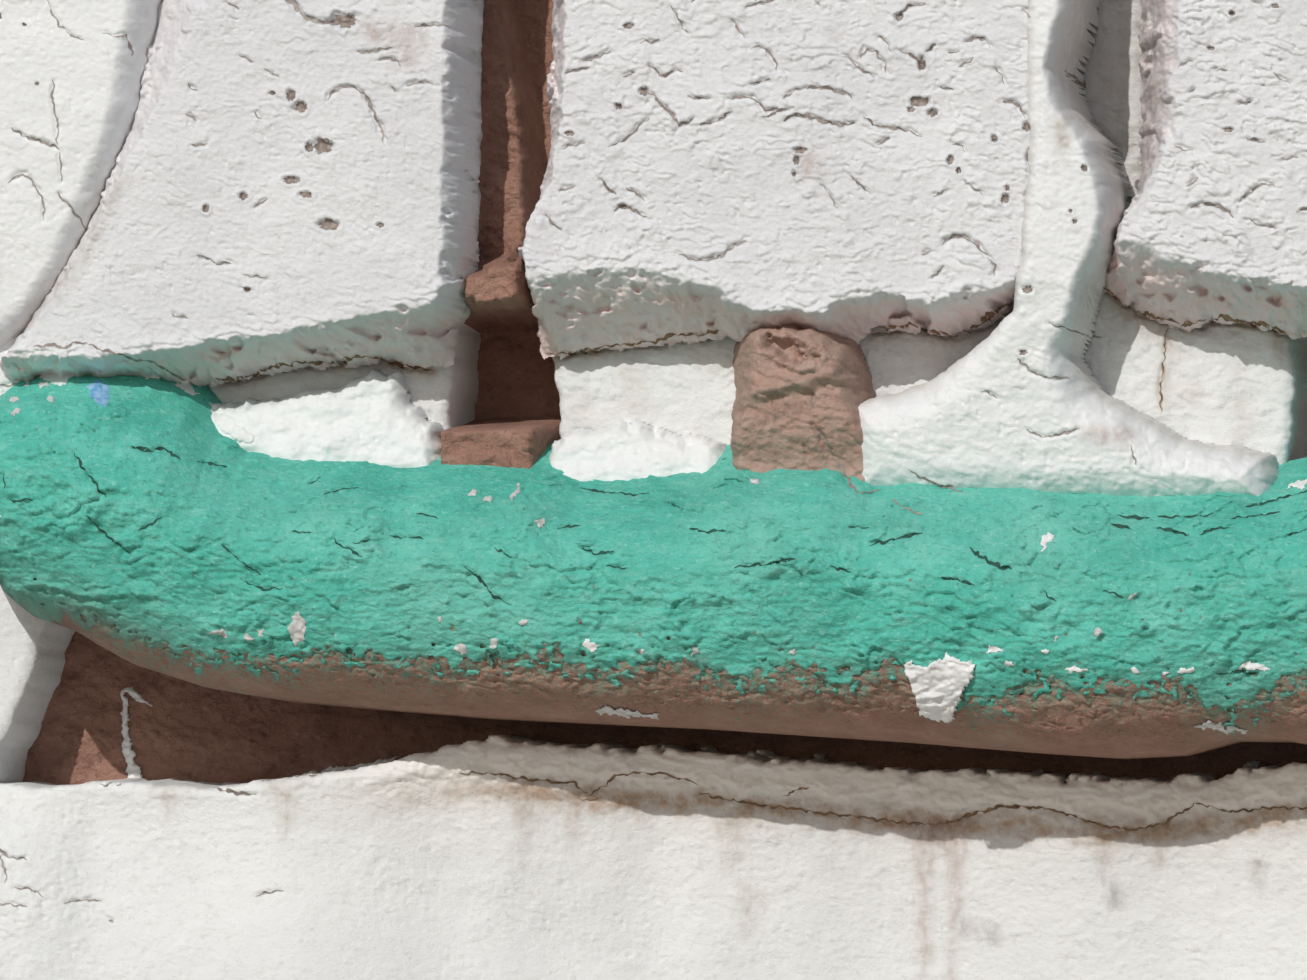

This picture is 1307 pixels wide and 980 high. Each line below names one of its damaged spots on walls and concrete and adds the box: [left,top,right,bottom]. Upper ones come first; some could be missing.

crack [564,0,1026,149]
crack [9,79,87,231]
crack [545,179,647,230]
crack [74,453,161,554]
crack [132,446,227,467]
crack [812,392,961,546]
crack [1112,490,1307,536]
crack [941,547,1012,585]
peeling [903,645,1013,723]
peeling [100,687,152,786]
crack [459,771,1307,831]
crack [0,849,113,922]